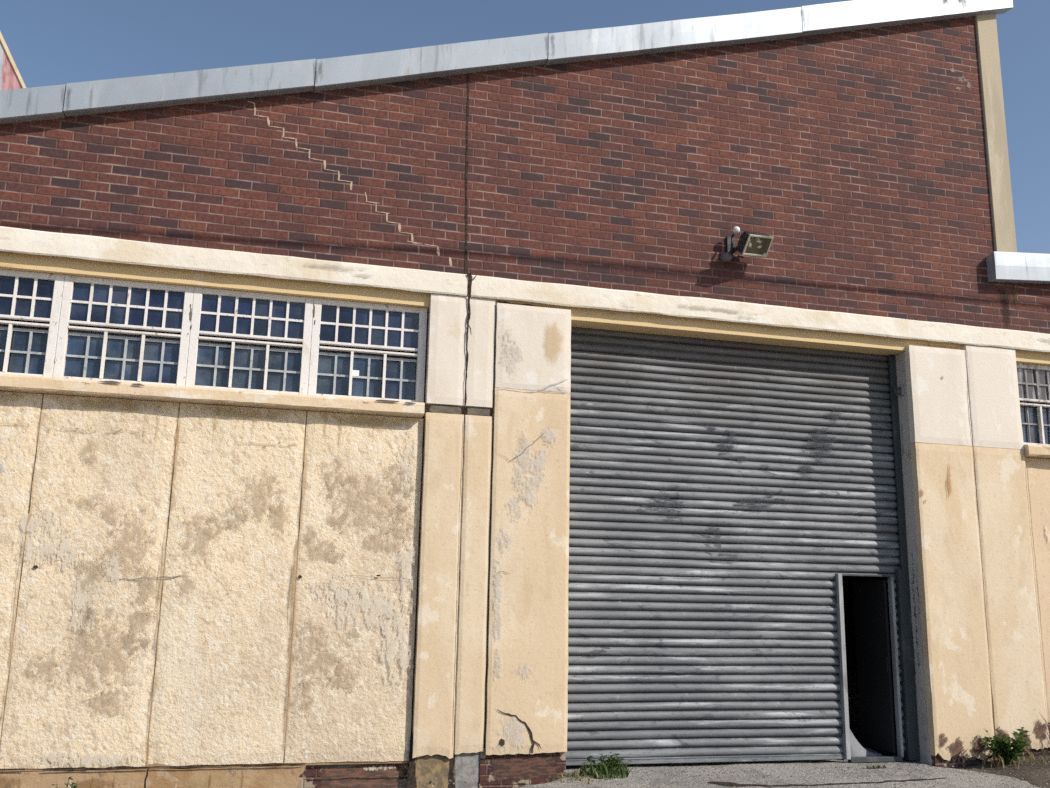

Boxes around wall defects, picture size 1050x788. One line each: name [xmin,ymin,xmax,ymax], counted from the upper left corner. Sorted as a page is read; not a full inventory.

crack [497,300,549,308]
water stain [546,328,560,356]
crack [503,379,568,392]
crack [247,73,477,788]
crack [497,709,542,754]